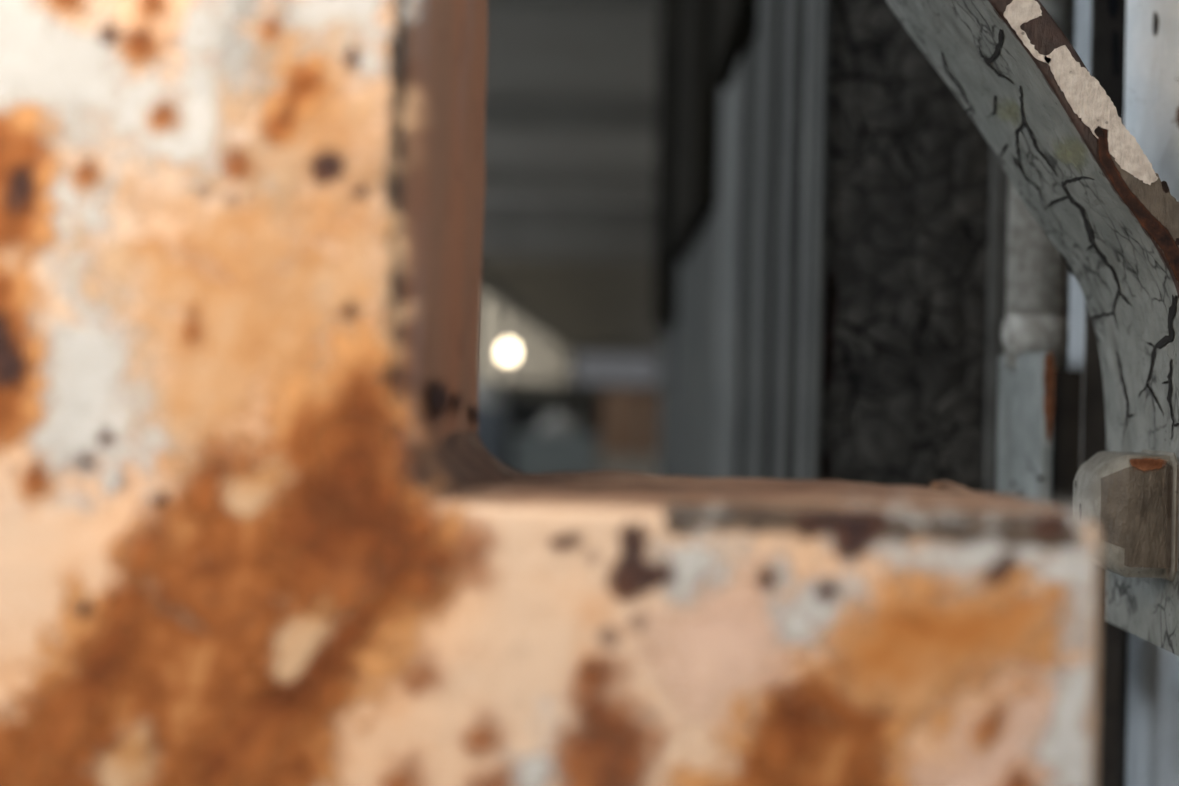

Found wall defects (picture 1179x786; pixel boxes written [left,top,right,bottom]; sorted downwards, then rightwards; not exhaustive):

rust [0,104,61,450]
rust [50,0,83,13]
rust [121,0,163,65]
rust [151,106,175,133]
rust [263,54,341,145]
crack [941,29,1179,444]
peeling [1004,0,1179,248]
rust [1098,126,1179,284]
rust [0,313,491,786]
rust [556,658,664,786]
rust [667,565,1066,786]
peeling [756,504,1093,786]